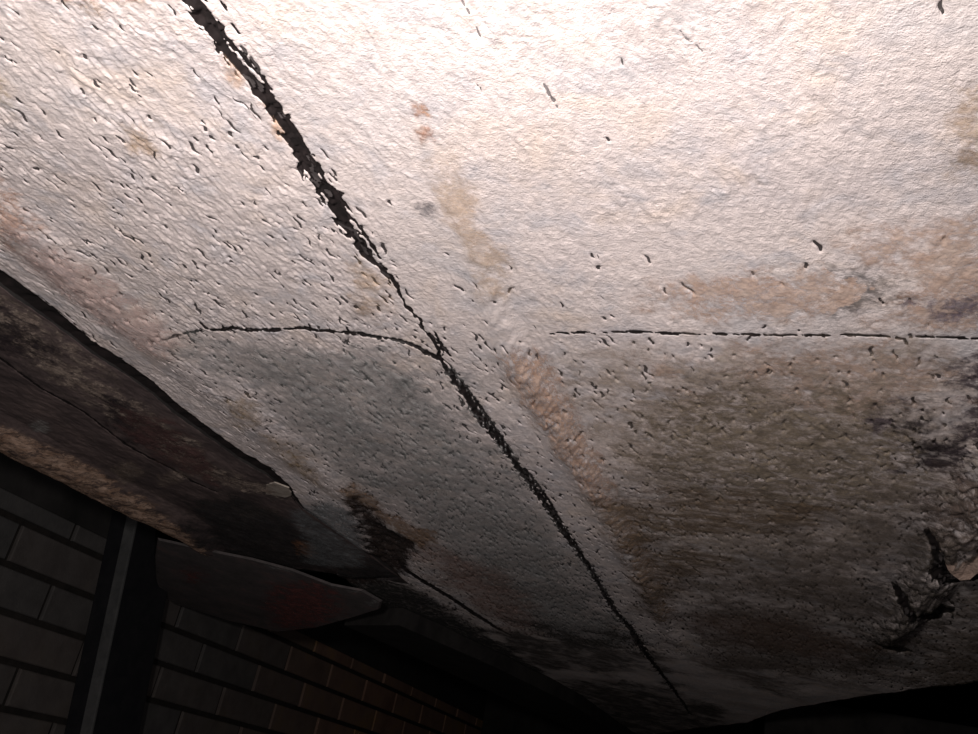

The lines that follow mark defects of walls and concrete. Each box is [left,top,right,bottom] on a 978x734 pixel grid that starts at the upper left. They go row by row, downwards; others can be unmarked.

crack [149,0,691,715]
leakage [180,349,723,734]
crack [550,330,978,345]
leakage [590,350,978,696]
spalling [860,426,978,652]
leakage [934,298,978,322]